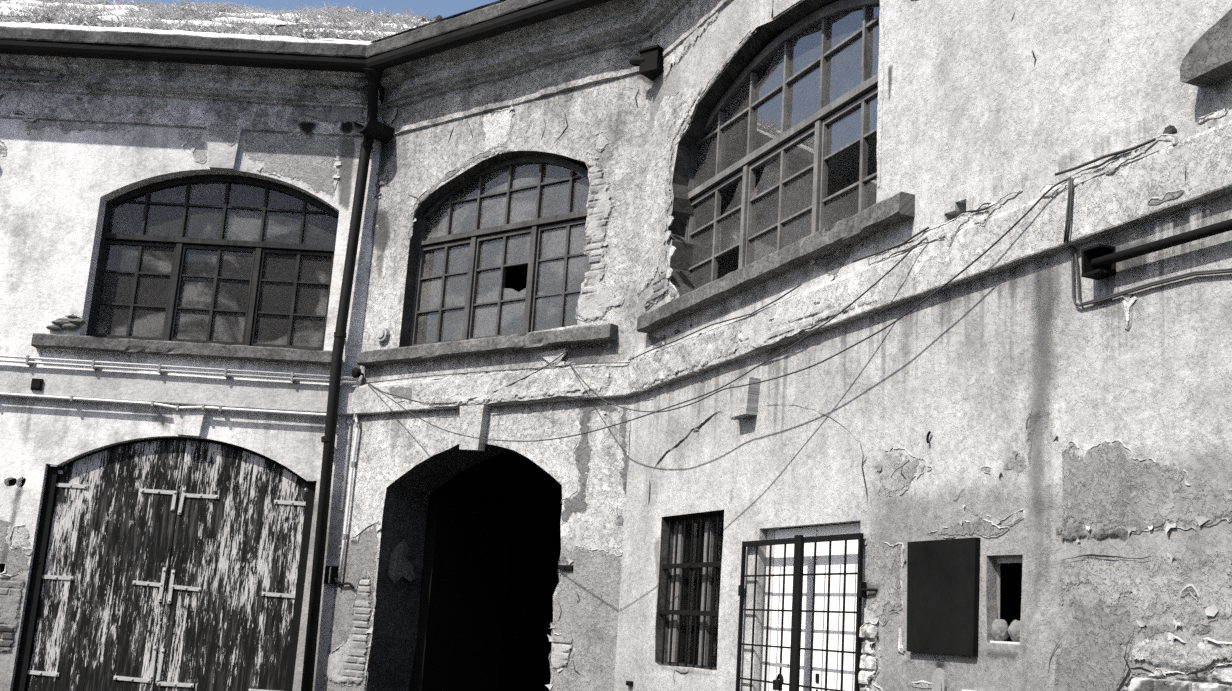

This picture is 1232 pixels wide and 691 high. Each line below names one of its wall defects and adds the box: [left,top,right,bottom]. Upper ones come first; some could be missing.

flaking render [576,10,757,322]
flaking render [1040,134,1178,198]
flaking render [1197,108,1229,128]
flaking render [811,189,1023,283]
flaking render [387,297,882,523]
crack [628,411,722,504]
flaking render [874,444,932,499]
flaking render [1050,433,1232,542]
flaking render [0,520,33,653]
flaking render [323,520,416,691]
flaking render [546,545,623,691]
flaking render [1059,551,1232,691]